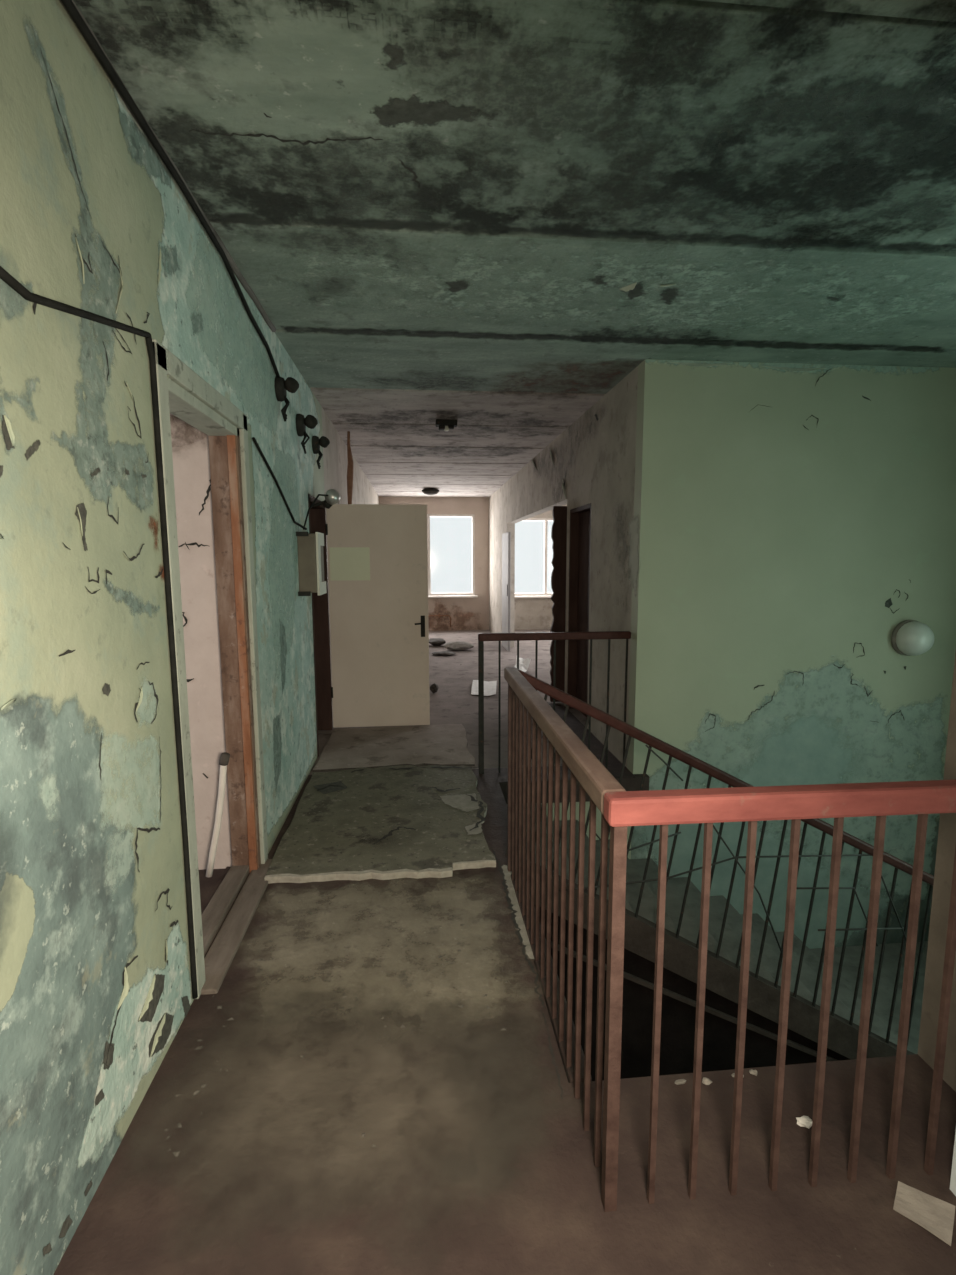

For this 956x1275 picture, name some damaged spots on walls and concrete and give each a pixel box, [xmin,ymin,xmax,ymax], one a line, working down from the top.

damp [73,0,226,70]
damp [149,0,956,252]
peeling [0,23,154,551]
peeling [649,643,946,790]
peeling [0,681,192,1275]
peeling [631,813,938,949]